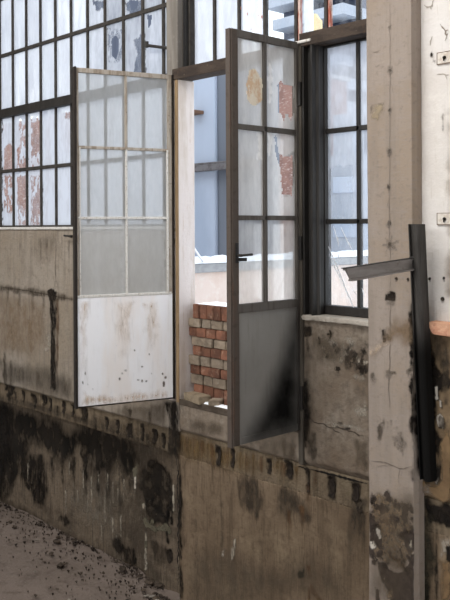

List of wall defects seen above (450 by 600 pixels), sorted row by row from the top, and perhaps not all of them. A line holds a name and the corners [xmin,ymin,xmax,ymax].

leakage [3,289,72,394]
leakage [0,391,180,565]
leakage [304,381,316,457]
crack [310,418,363,436]
flaking render [423,386,450,502]
peeling [351,482,414,600]